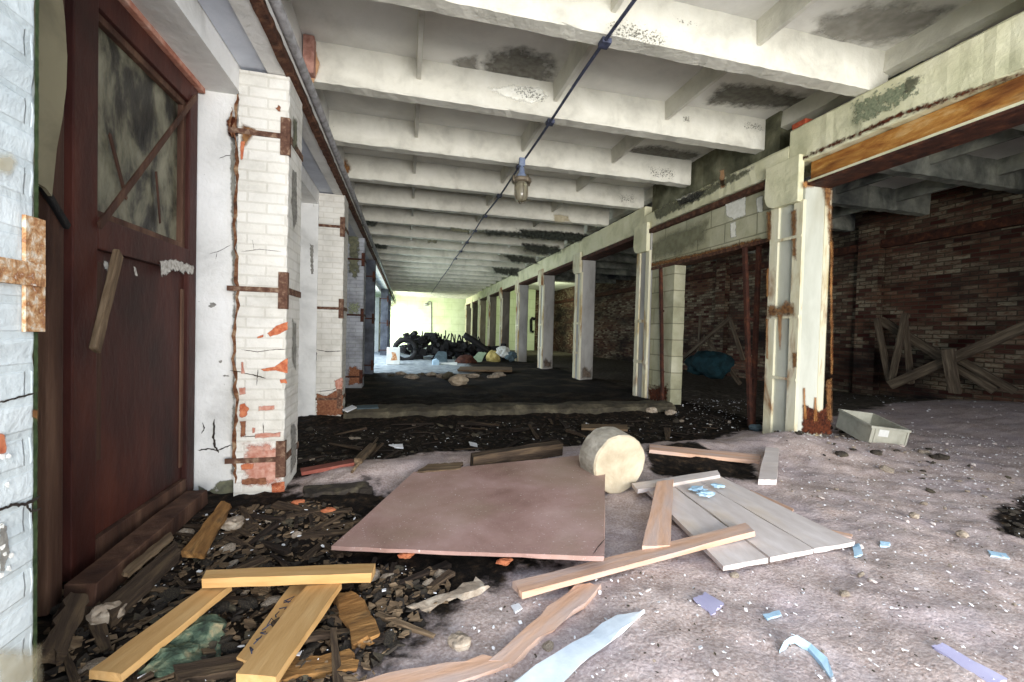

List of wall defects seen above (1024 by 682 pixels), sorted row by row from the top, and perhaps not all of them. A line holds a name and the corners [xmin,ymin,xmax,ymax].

leakage [816,4,952,43]
rust [226,116,255,160]
leakage [457,48,554,81]
leakage [708,84,805,107]
leakage [904,77,920,92]
rust [803,74,1024,159]
rust [802,182,833,435]
flaking render [257,320,296,383]
flaking render [316,365,361,416]
crack [199,419,275,453]
flaking render [198,388,309,505]